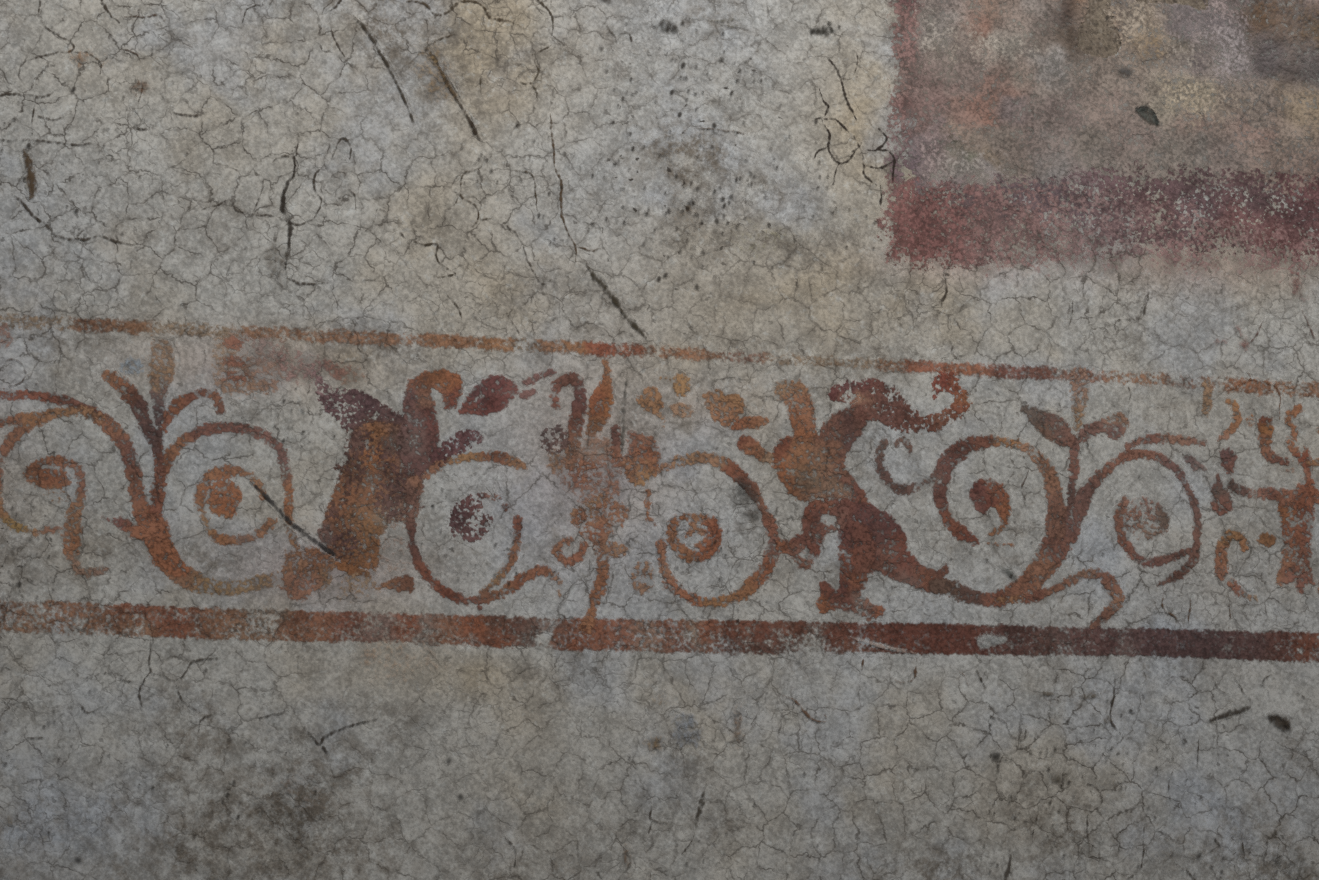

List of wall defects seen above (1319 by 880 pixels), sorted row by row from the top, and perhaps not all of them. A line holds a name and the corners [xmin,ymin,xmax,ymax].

crack [408,0,514,42]
crack [35,0,157,130]
crack [0,92,90,146]
crack [515,0,595,261]
crack [814,55,896,205]
crack [15,196,134,245]
crack [203,137,355,225]
crack [383,210,462,318]
crack [105,646,218,730]
crack [308,719,376,752]
crack [791,698,826,722]
crack [1110,689,1124,748]